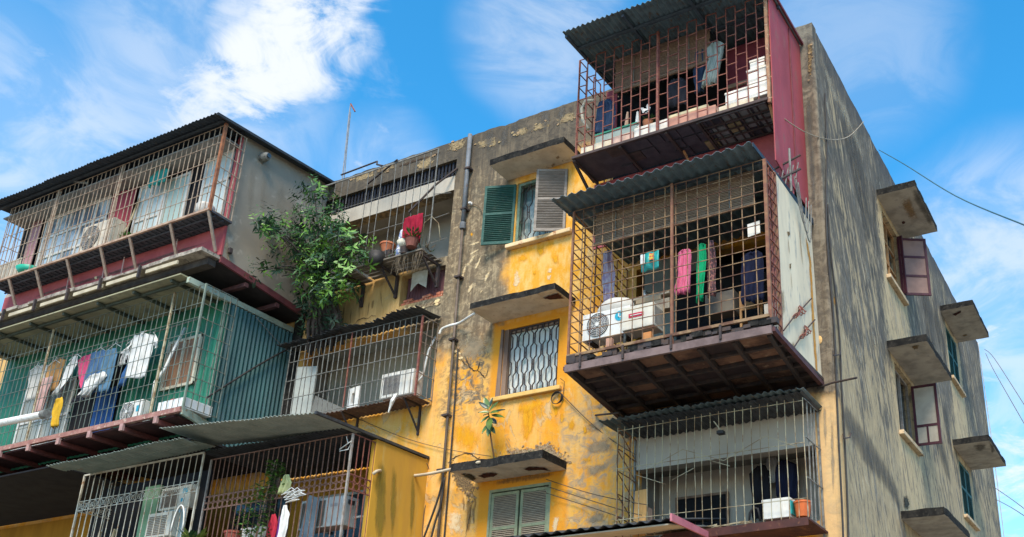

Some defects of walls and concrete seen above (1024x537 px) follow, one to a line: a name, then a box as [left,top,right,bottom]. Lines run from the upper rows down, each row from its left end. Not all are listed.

peeling [511,113,575,136]
peeling [449,137,501,151]
rust [788,232,818,371]
leakage [519,401,541,438]
spalling [500,441,572,463]